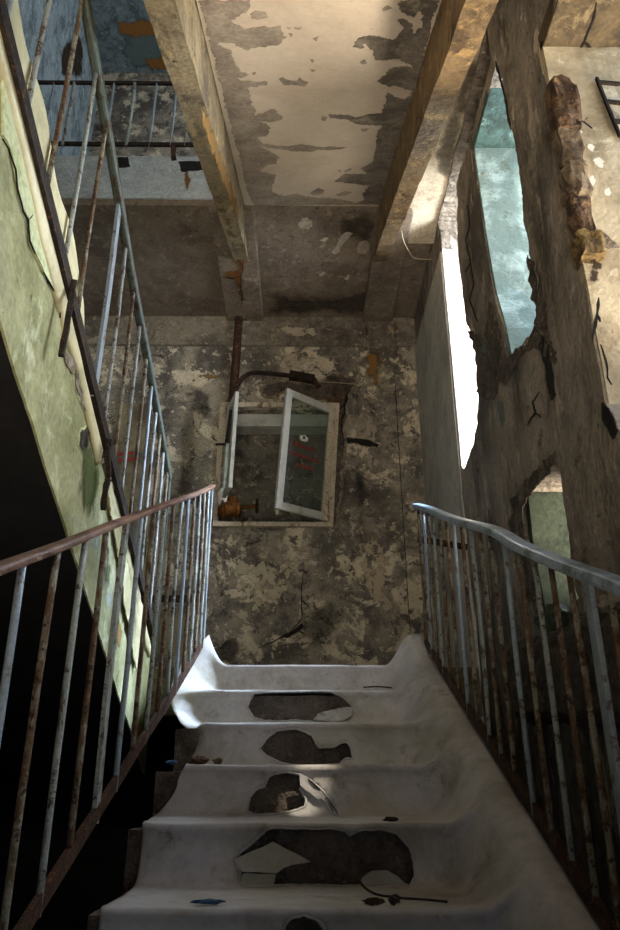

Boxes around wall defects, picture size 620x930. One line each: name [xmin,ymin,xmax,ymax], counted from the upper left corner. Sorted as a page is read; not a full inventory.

peeling [198,0,440,206]
spalling [544,74,620,271]
crack [2,139,61,318]
peeling [278,326,316,337]
flaking render [467,255,557,425]
flaking render [261,371,380,530]
crack [527,392,541,426]
spalling [601,402,618,439]
flaking render [508,451,555,540]
flaking render [218,638,240,663]
peeling [230,553,303,626]
crack [258,576,309,648]